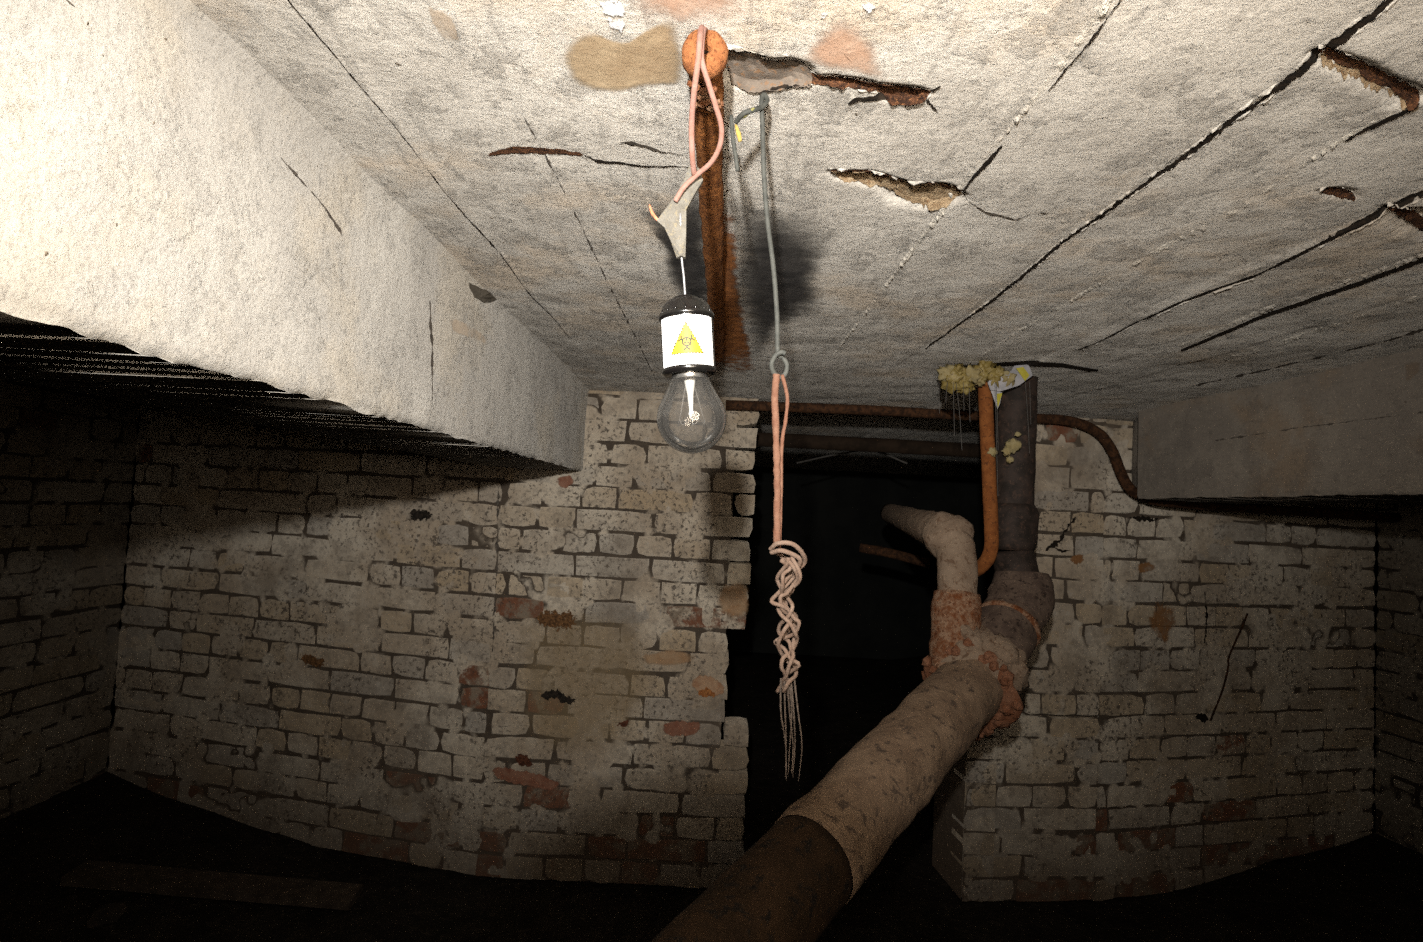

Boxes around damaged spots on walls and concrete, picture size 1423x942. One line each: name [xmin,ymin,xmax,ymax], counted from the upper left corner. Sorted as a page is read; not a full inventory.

water stain [567,25,680,90]
spalling [727,44,941,111]
crack [288,0,566,333]
spalling [830,168,1046,220]
crack [925,0,1423,352]
crack [489,116,688,381]
crack [1180,329,1423,389]